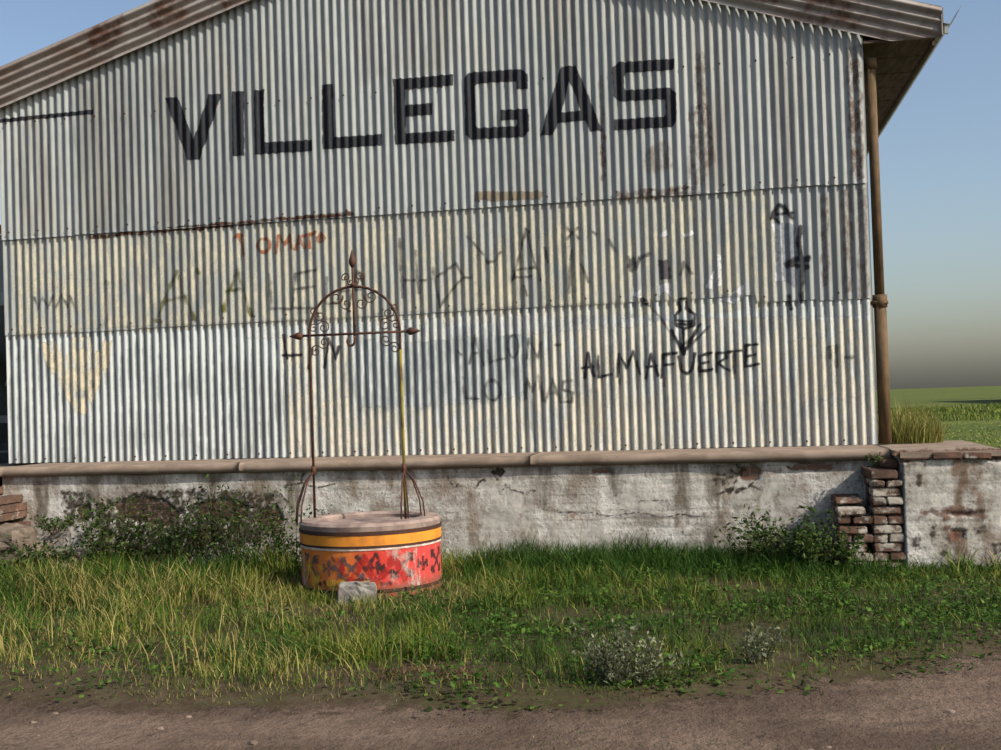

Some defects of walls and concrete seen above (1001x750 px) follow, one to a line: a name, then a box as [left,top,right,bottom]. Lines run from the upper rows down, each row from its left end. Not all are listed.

crack [448,477,700,518]
crack [717,473,760,495]
peeling [894,448,1001,551]